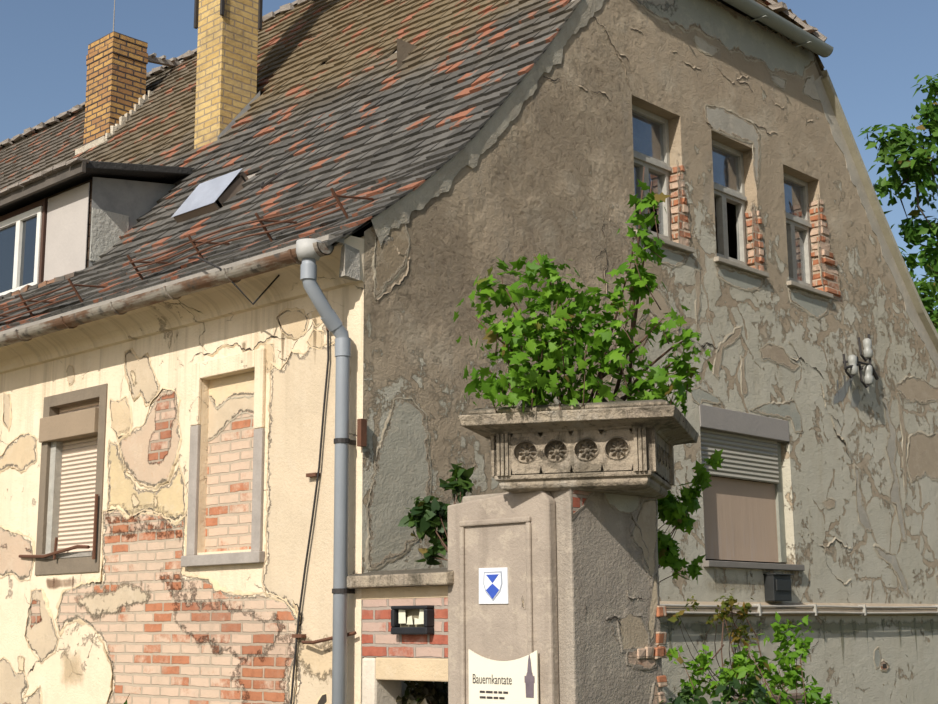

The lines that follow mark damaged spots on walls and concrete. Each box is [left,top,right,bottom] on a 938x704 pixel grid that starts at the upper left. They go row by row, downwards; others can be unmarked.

crack [545,77,610,101]
flaking render [0,307,336,704]
crack [192,331,295,360]
flaking render [364,397,433,571]
crack [594,213,610,324]
peeling [616,273,680,348]
peeling [713,325,743,380]
peeling [760,343,800,371]
crack [788,341,852,462]
peeling [895,375,938,500]